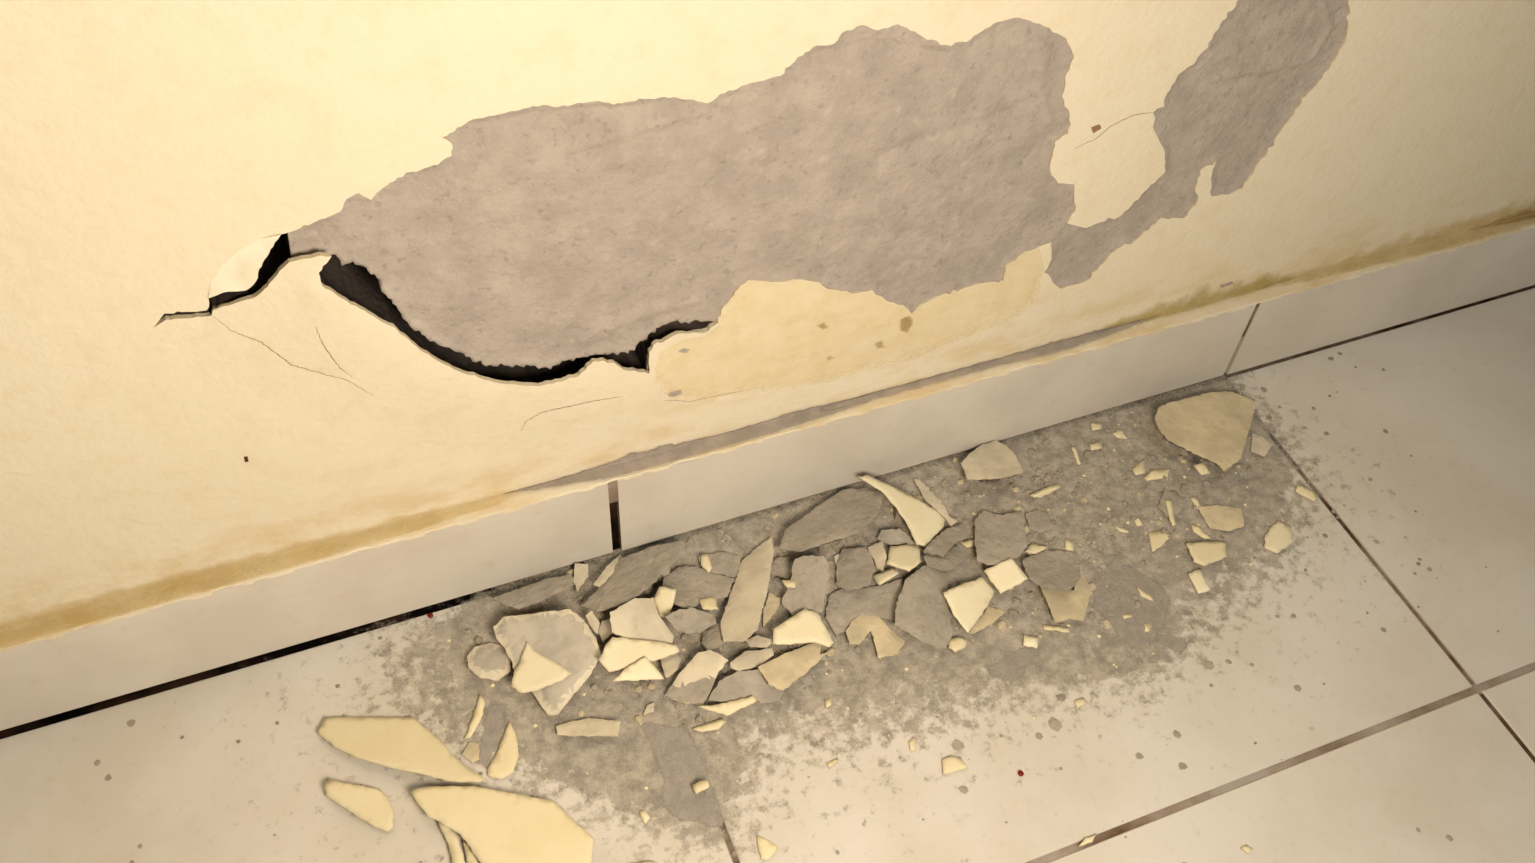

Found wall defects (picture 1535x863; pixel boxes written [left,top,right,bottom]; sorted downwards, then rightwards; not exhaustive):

peeling [208,0,1349,369]
crack [209,239,374,396]
peeling [1155,391,1273,472]